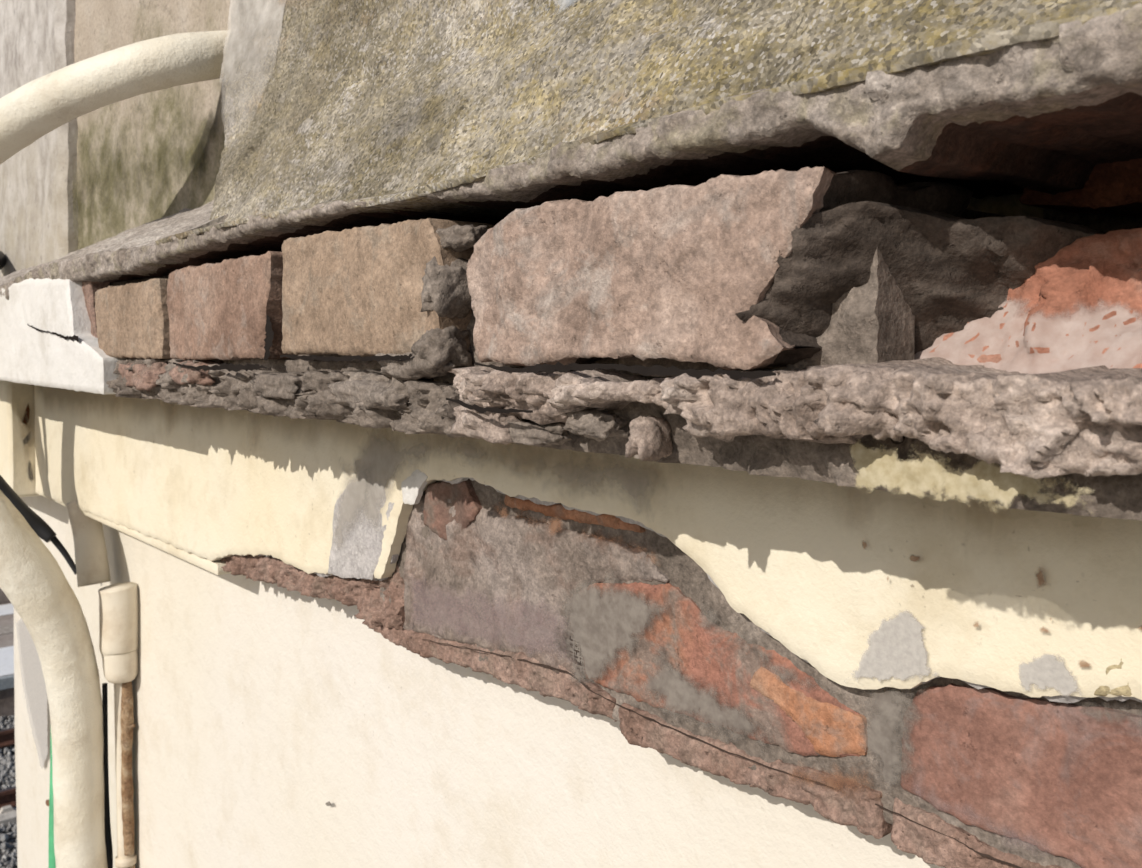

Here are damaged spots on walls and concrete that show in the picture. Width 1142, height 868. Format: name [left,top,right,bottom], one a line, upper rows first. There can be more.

spalling [914,159,1142,374]
crack [27,324,79,342]
spalling [82,281,110,338]
spalling [327,224,487,411]
spalling [118,360,222,391]
spalling [249,373,313,399]
spalling [450,399,734,461]
spalling [802,412,903,444]
spalling [220,469,1142,868]